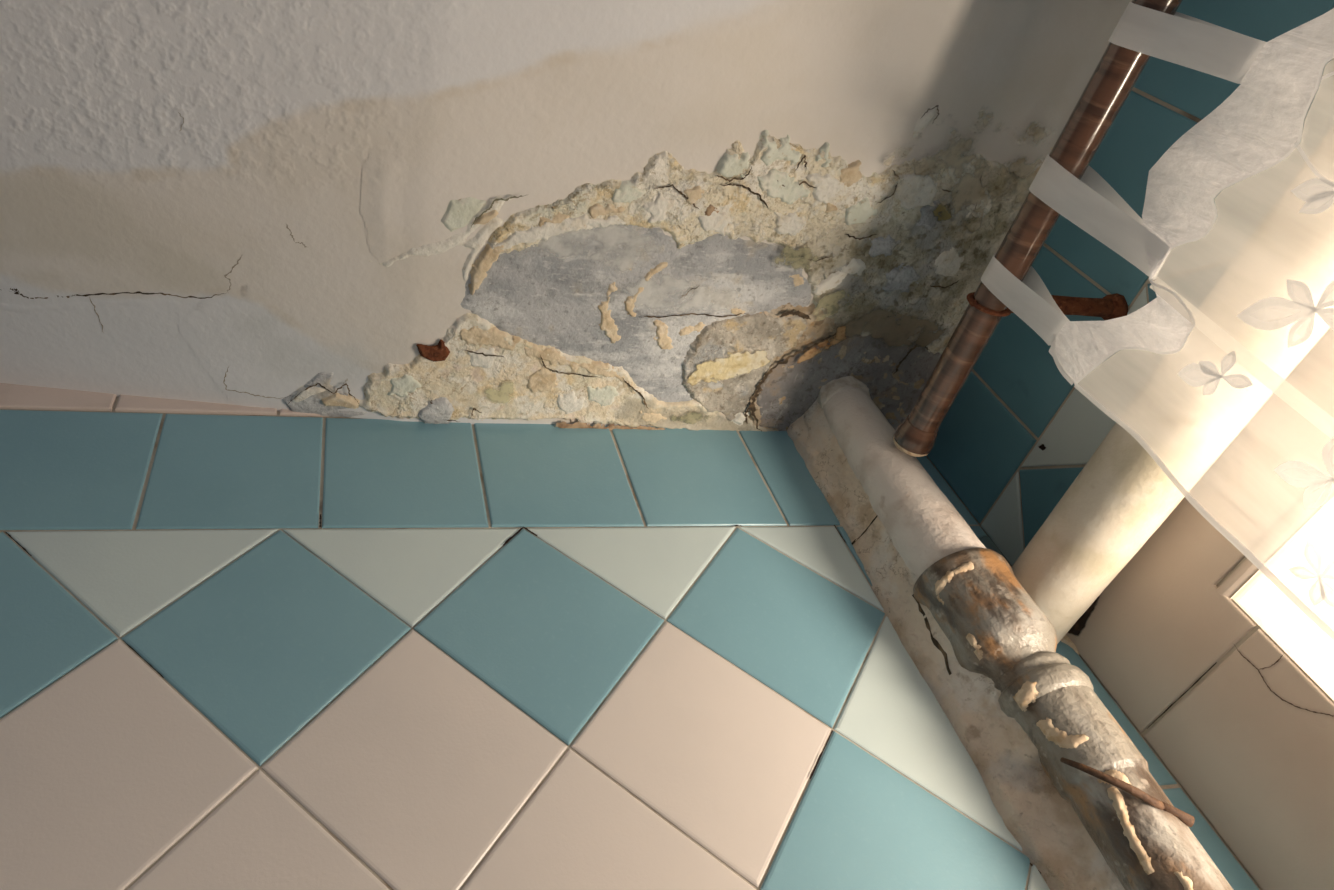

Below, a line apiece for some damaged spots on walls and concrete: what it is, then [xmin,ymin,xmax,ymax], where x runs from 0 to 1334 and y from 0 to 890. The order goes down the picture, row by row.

water stain [0,0,1132,418]
crack [0,256,242,332]
flaking render [282,130,1053,432]
corrosion [416,339,450,362]
crack [744,310,837,432]
water stain [451,417,619,425]
crack [1147,646,1332,729]